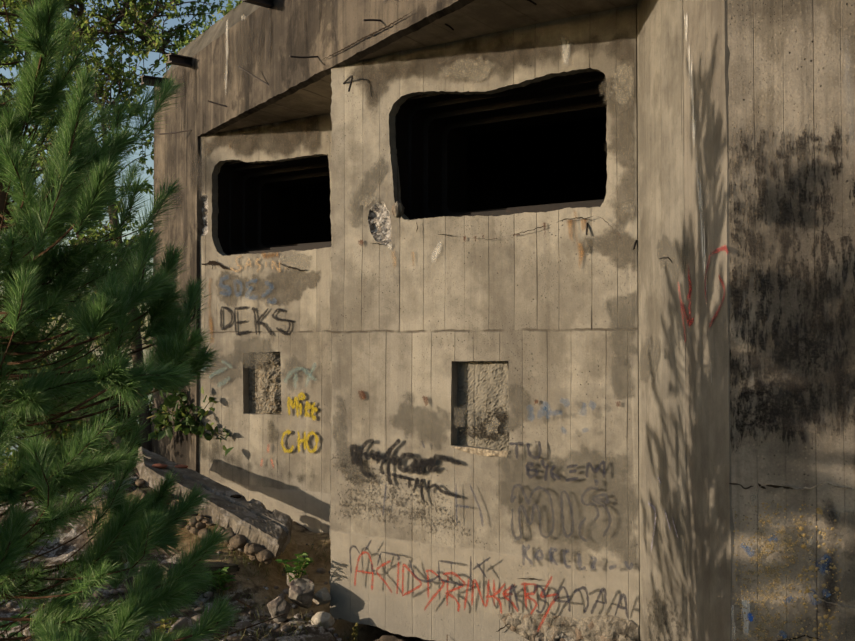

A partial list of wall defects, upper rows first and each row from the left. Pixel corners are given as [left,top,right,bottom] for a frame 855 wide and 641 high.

spalling [362,196,405,245]
water stain [728,124,855,451]
spalling [452,447,508,457]
crack [729,482,855,490]
spalling [497,613,639,641]